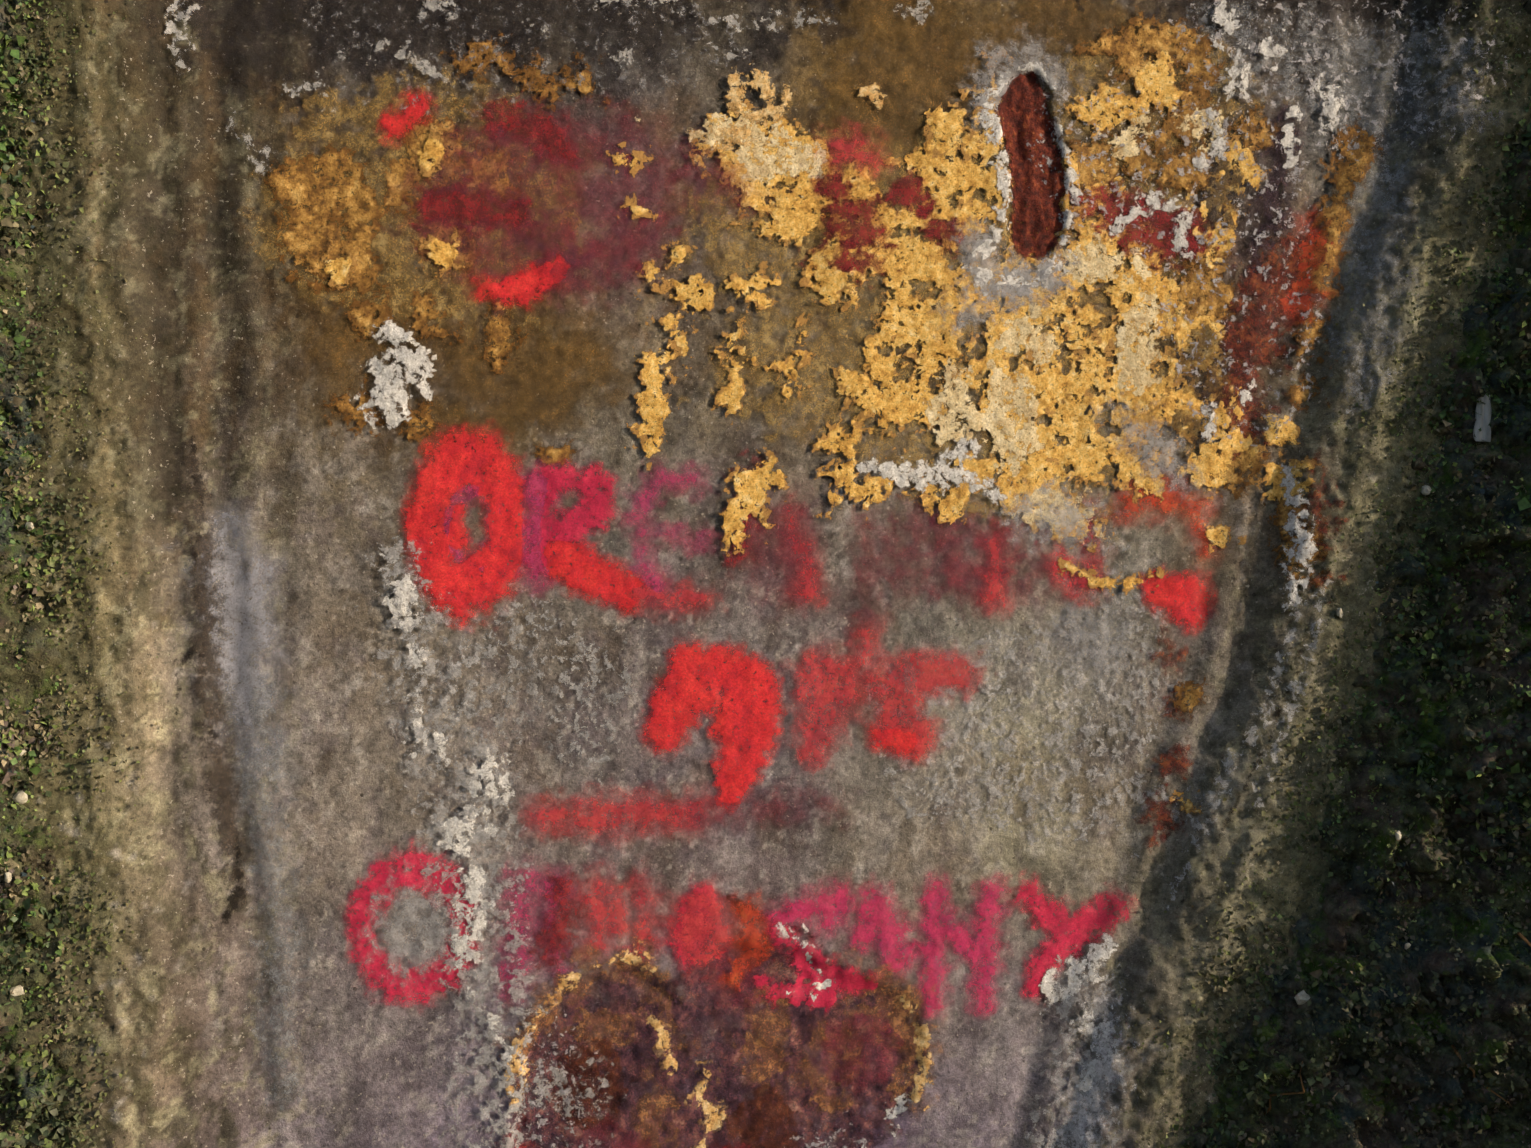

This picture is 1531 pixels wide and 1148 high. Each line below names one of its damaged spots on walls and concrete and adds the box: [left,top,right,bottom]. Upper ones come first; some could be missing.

peeling [606,141,658,222]
peeling [624,5,1385,601]
peeling [1169,677,1212,718]
water stain [200,513,313,1111]
peeling [1169,789,1203,815]